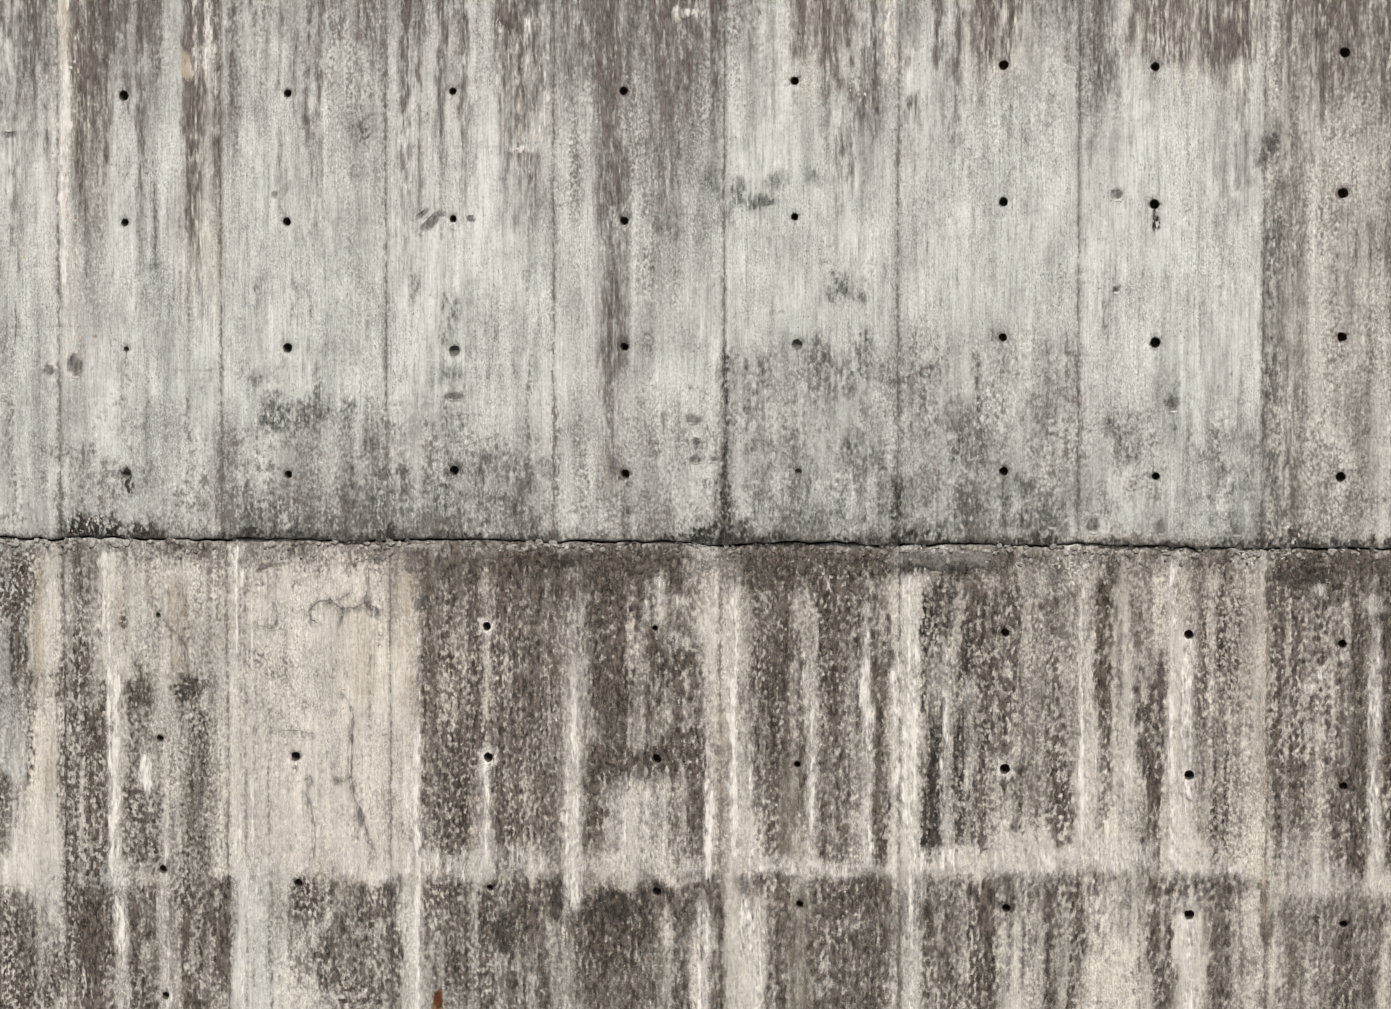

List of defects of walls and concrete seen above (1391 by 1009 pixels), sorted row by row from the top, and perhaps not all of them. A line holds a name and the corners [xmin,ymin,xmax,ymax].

leakage [67,0,162,222]
leakage [181,0,233,256]
leakage [278,0,382,142]
leakage [399,0,470,193]
leakage [492,0,723,221]
leakage [791,0,884,116]
leakage [933,0,1074,75]
leakage [1129,0,1262,105]
leakage [1279,0,1391,116]
leakage [1261,177,1304,421]
crack [259,557,380,629]
corrosion [432,989,443,1009]